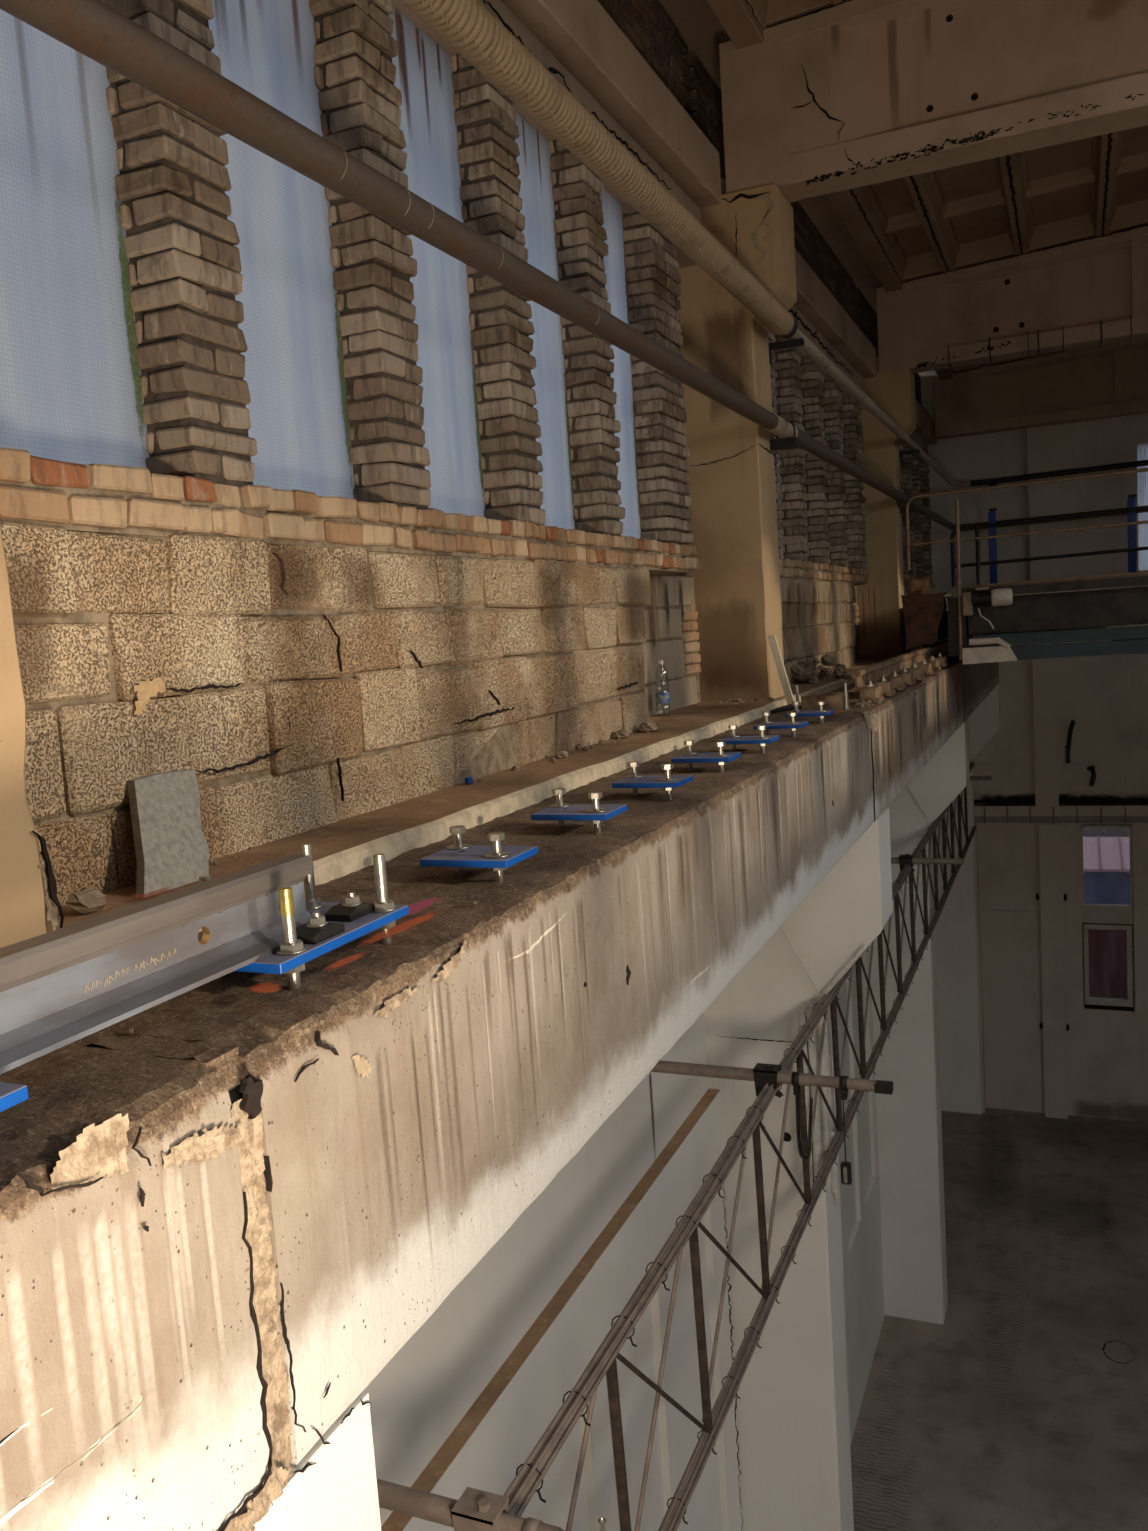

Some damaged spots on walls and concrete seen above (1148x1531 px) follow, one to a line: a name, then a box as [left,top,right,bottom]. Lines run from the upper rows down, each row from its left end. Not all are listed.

crack [745,0,851,30]
crack [792,64,1148,284]
crack [272,552,289,596]
crack [323,615,343,672]
crack [167,683,242,693]
crack [454,690,515,724]
crack [196,717,294,773]
crack [336,758,344,801]
spalling [162,1076,263,1169]
spalling [50,1113,129,1190]